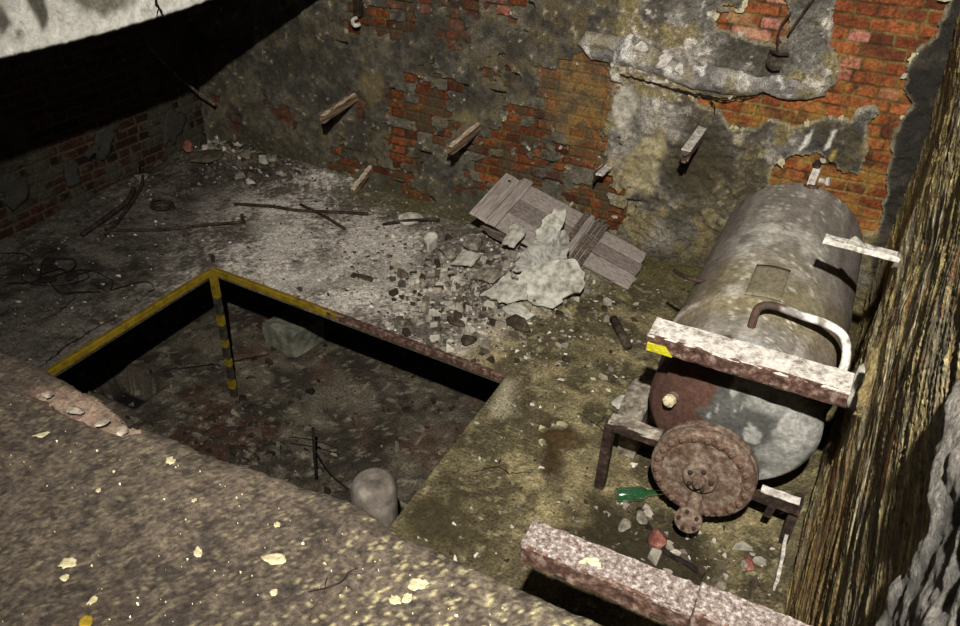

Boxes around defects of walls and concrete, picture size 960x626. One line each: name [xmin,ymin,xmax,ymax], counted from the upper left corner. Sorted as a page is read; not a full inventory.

spalling [345,0,415,41]
spalling [441,0,527,24]
spalling [327,72,464,202]
spalling [464,52,629,230]
spalling [688,0,951,233]